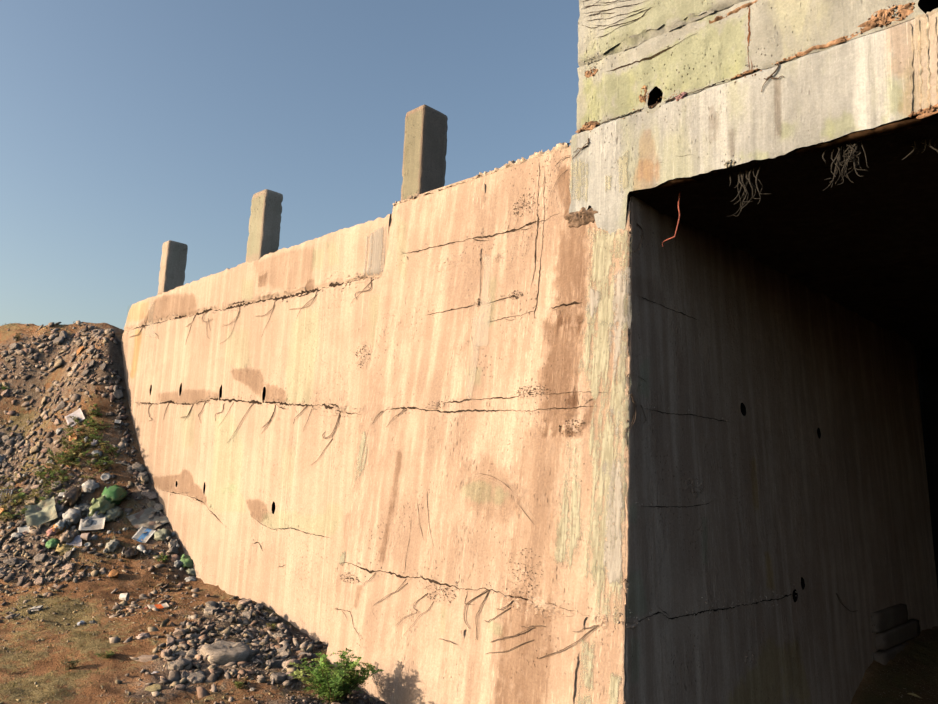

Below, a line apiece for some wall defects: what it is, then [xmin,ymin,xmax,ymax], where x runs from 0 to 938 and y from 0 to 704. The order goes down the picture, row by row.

crack [402,166,583,326]
crack [126,269,383,335]
crack [134,384,618,417]
leakage [579,267,632,623]
crack [250,514,329,567]
crack [337,501,592,616]
crack [613,584,801,633]